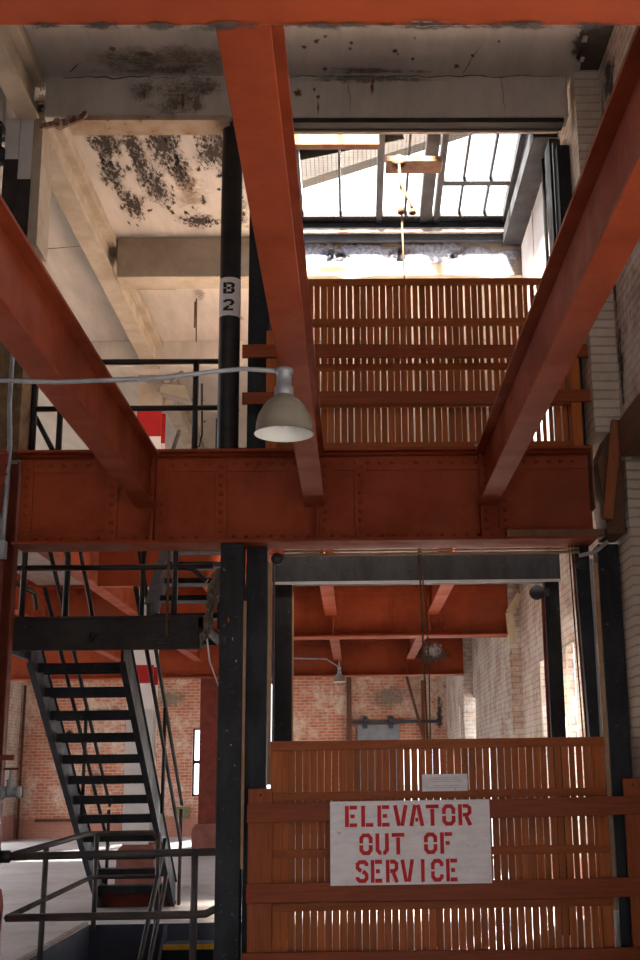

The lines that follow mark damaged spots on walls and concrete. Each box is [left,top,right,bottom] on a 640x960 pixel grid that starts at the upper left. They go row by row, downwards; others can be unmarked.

leakage [107,47,221,114]
crack [290,45,559,112]
peeling [305,243,521,278]